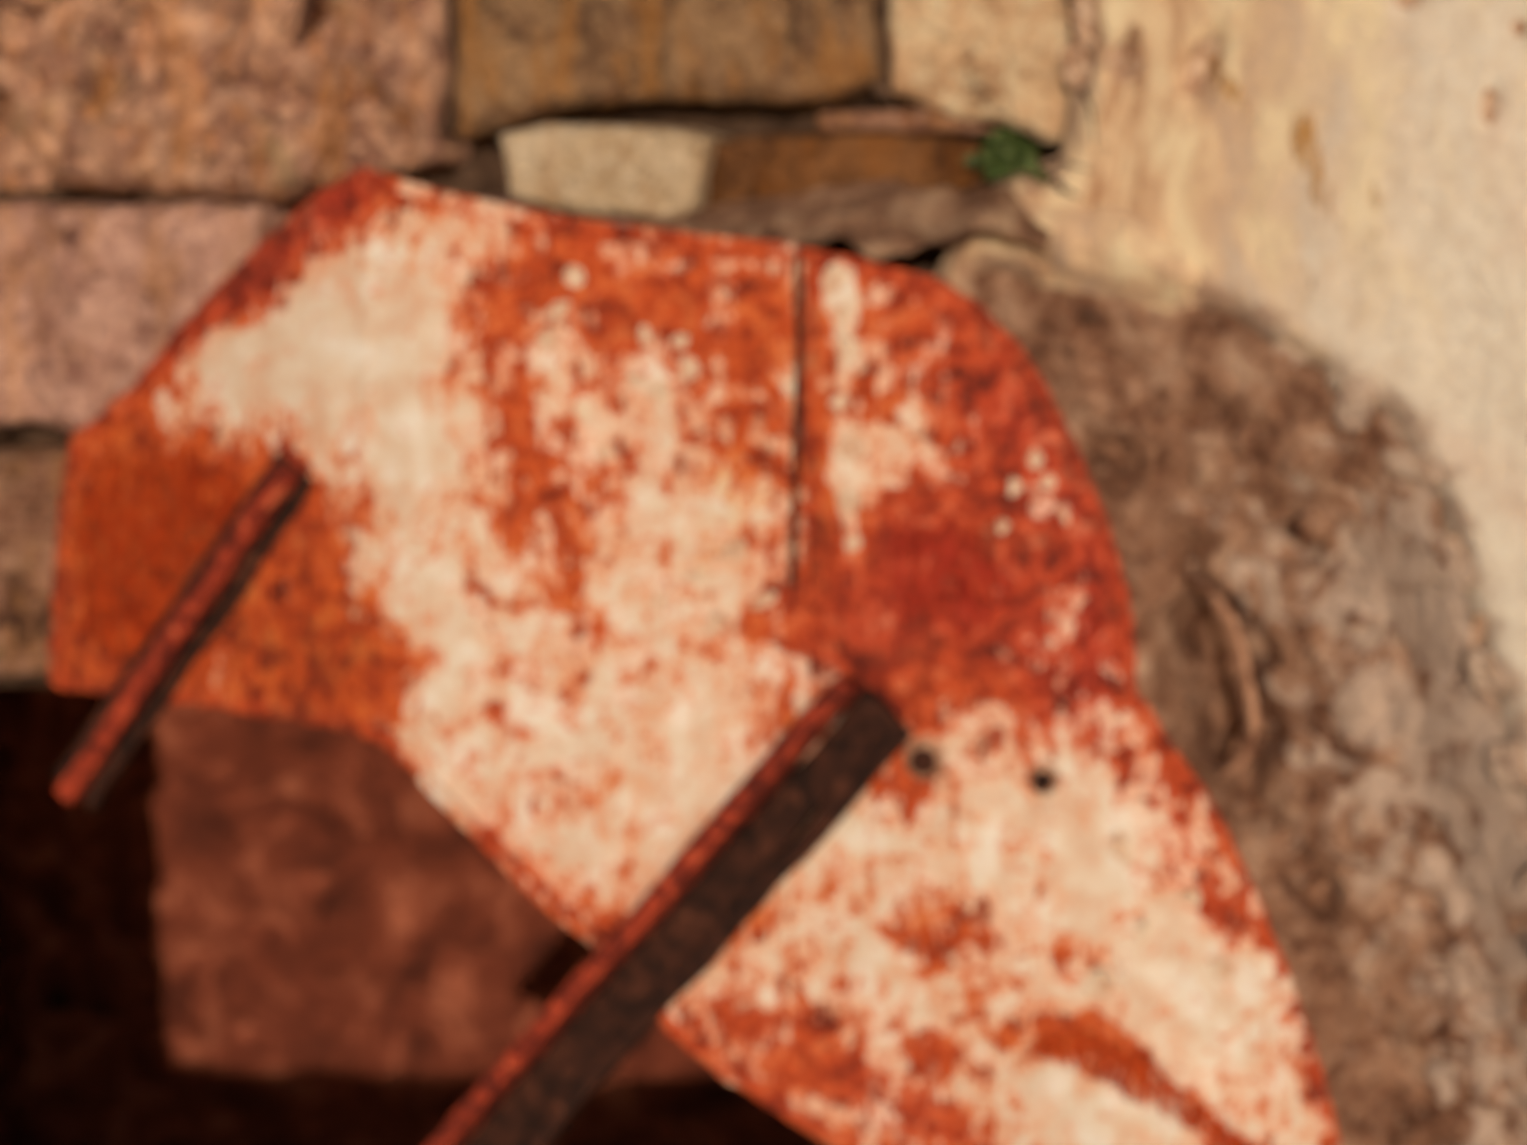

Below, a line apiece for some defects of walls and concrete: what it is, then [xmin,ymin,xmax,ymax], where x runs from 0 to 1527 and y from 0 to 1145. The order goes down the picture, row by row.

rust [1035,1027,1255,1145]
spalling [972,270,1527,1145]